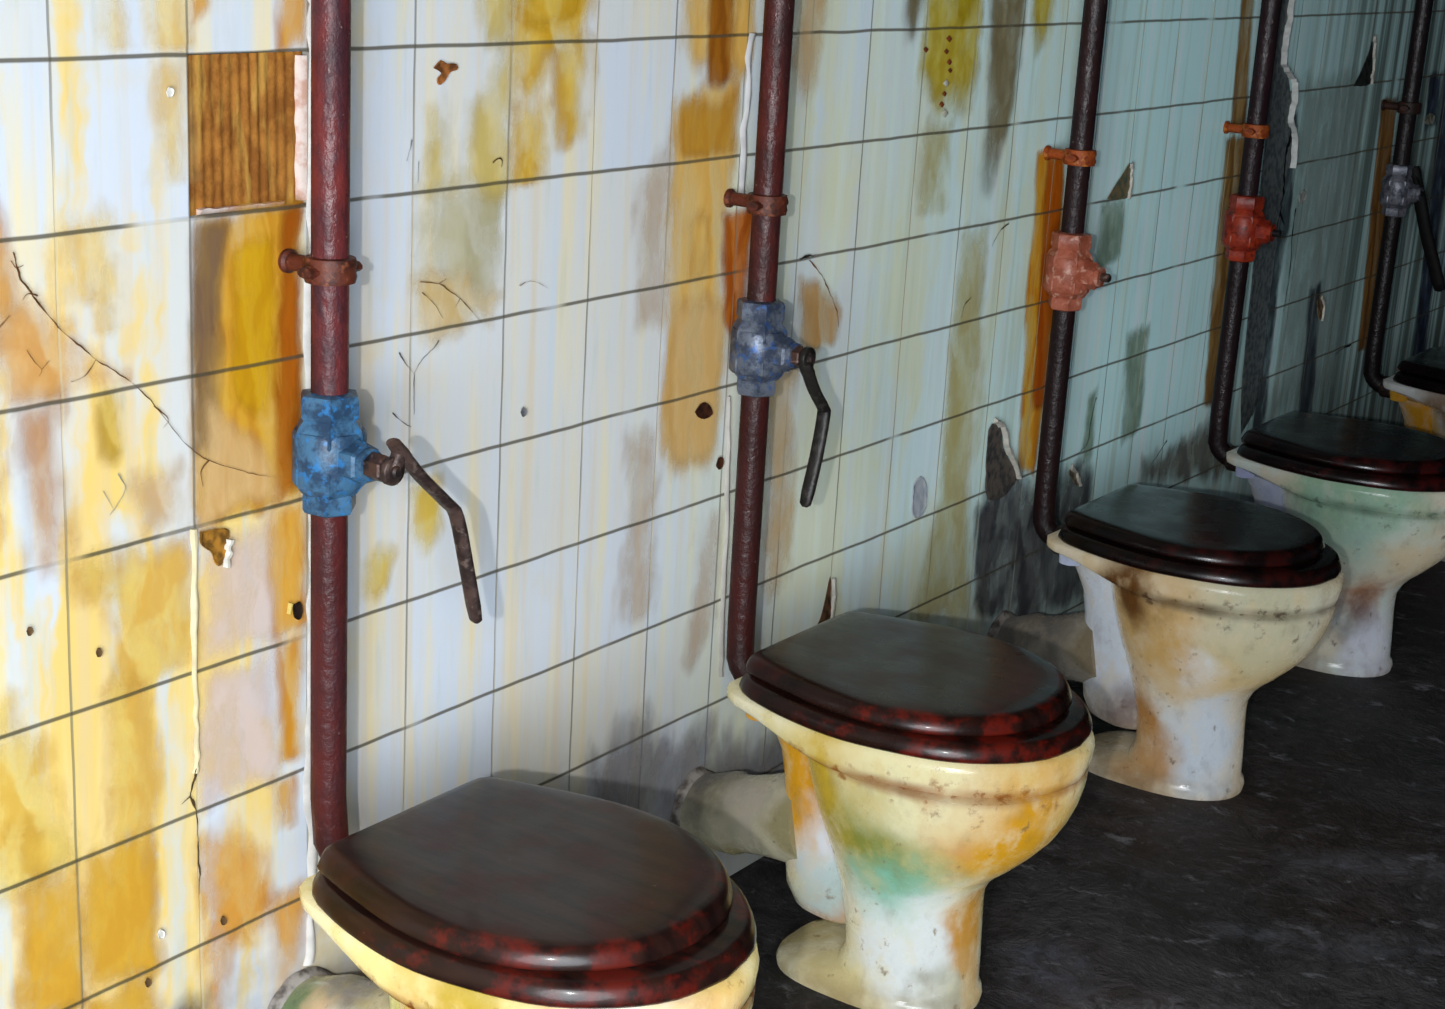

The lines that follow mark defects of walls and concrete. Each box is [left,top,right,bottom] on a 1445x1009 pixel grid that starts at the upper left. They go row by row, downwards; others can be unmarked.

spalling [434,60,458,85]
leakage [0,236,68,399]
crack [0,252,271,485]
spalling [199,528,234,568]
rust [662,0,752,462]
leakage [918,246,1082,618]
peeling [985,418,1022,500]
rust [1019,152,1063,472]
leakage [1123,330,1147,438]
peeling [1241,0,1307,434]
leakage [0,543,192,1009]
leakage [206,841,303,957]